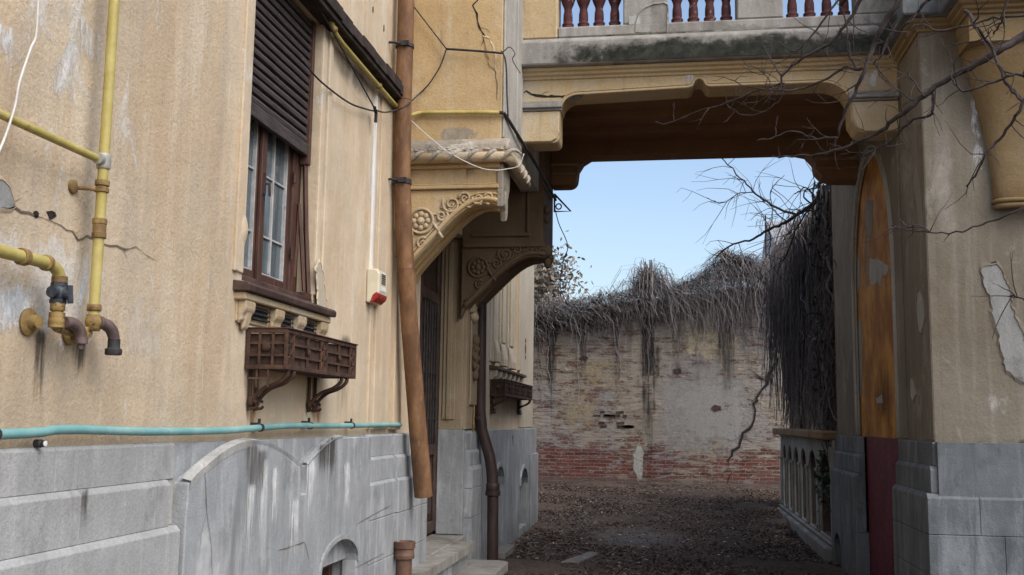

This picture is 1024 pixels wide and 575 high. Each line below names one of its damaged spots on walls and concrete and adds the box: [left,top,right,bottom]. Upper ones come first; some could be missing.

damp [555,14,897,63]
spalling [0,175,17,214]
crack [3,197,157,261]
spalling [315,259,327,308]
peeling [869,258,889,288]
damp [36,330,45,377]
damp [547,317,558,386]
damp [642,297,655,417]
peeling [979,260,1024,385]
spalling [593,411,634,428]
damp [247,445,278,535]
damp [291,438,350,542]